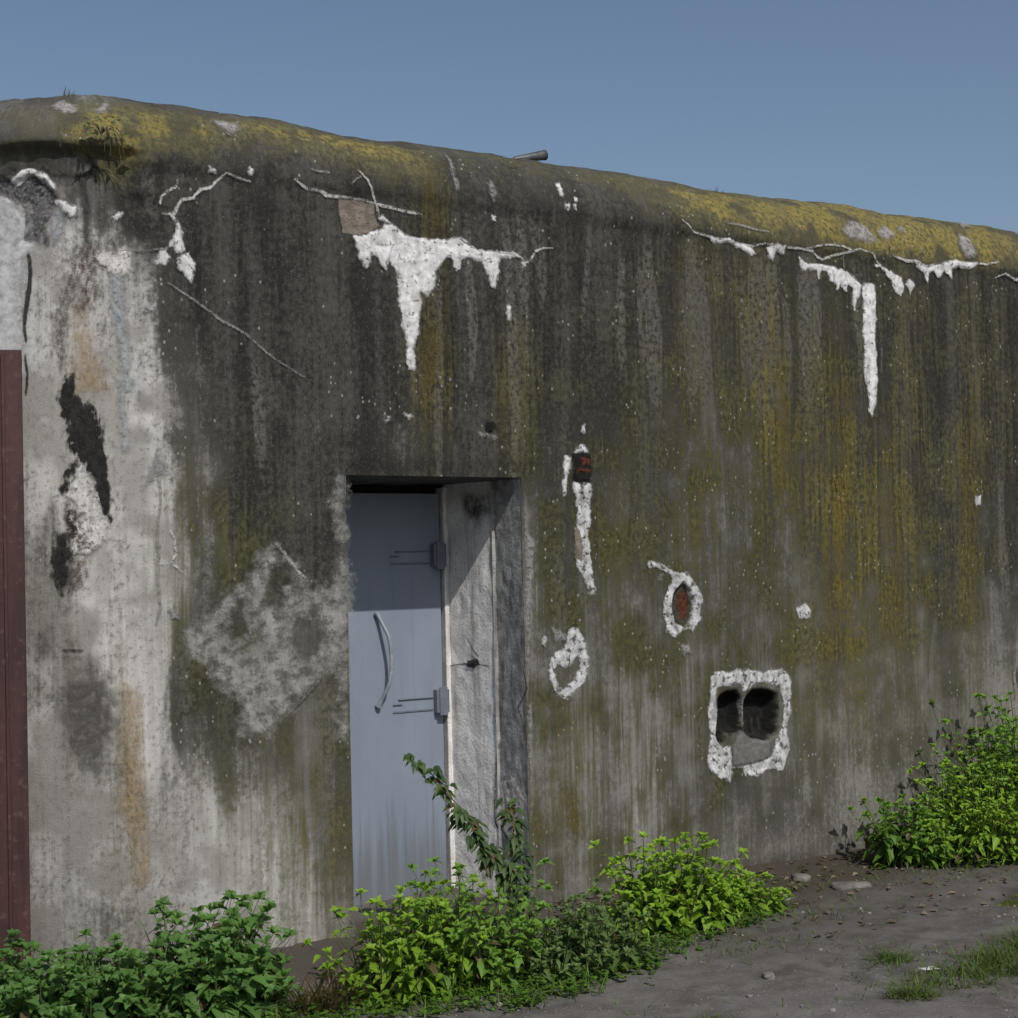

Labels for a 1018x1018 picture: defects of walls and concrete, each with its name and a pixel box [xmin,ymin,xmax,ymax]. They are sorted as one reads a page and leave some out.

crack [159,166,253,225]
leakage [155,223,195,281]
crack [168,283,304,377]
leakage [354,216,525,370]
crack [683,220,934,268]
leakage [799,257,878,415]
leakage [916,260,977,282]
crack [974,261,1018,281]
spalling [562,444,596,595]
spalling [647,561,703,655]
spalling [494,527,590,858]
spalling [707,668,792,782]